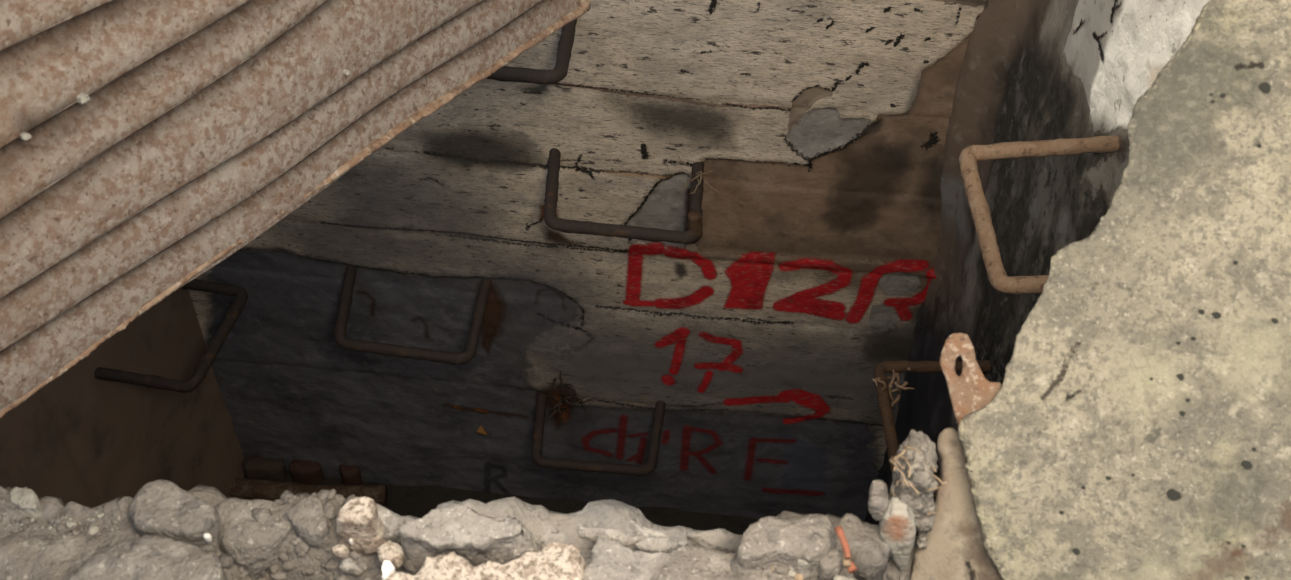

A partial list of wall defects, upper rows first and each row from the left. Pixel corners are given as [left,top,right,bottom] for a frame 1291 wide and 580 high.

peeling [620,0,1049,333]
peeling [1063,0,1210,134]